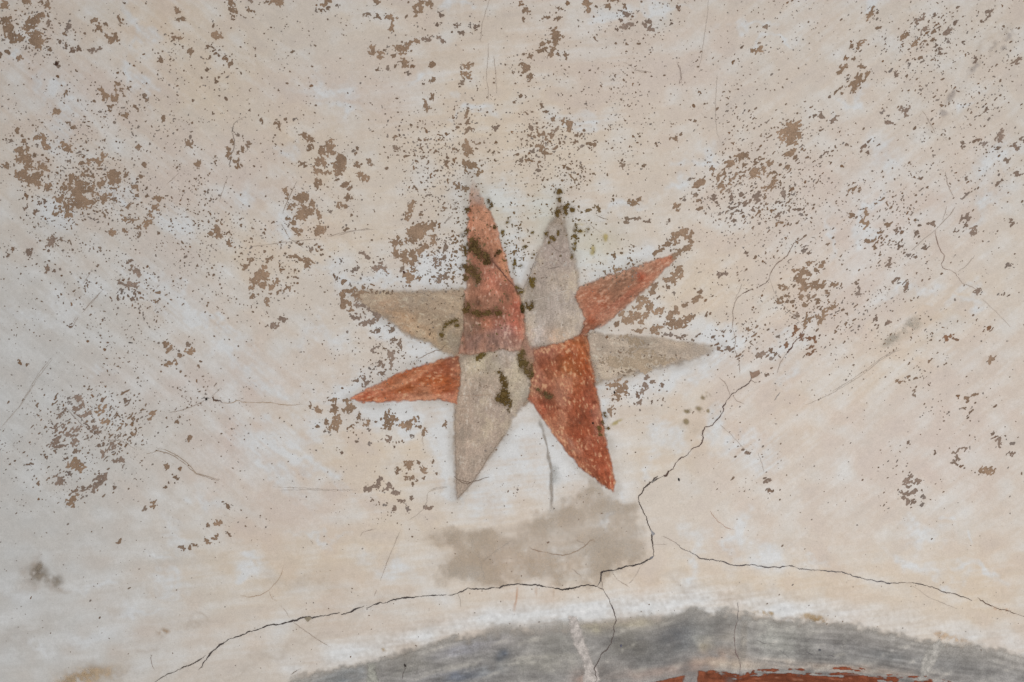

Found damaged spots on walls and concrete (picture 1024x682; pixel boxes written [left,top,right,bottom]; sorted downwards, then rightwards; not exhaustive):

peeling [0,0,1024,538]
crack [150,235,1024,681]